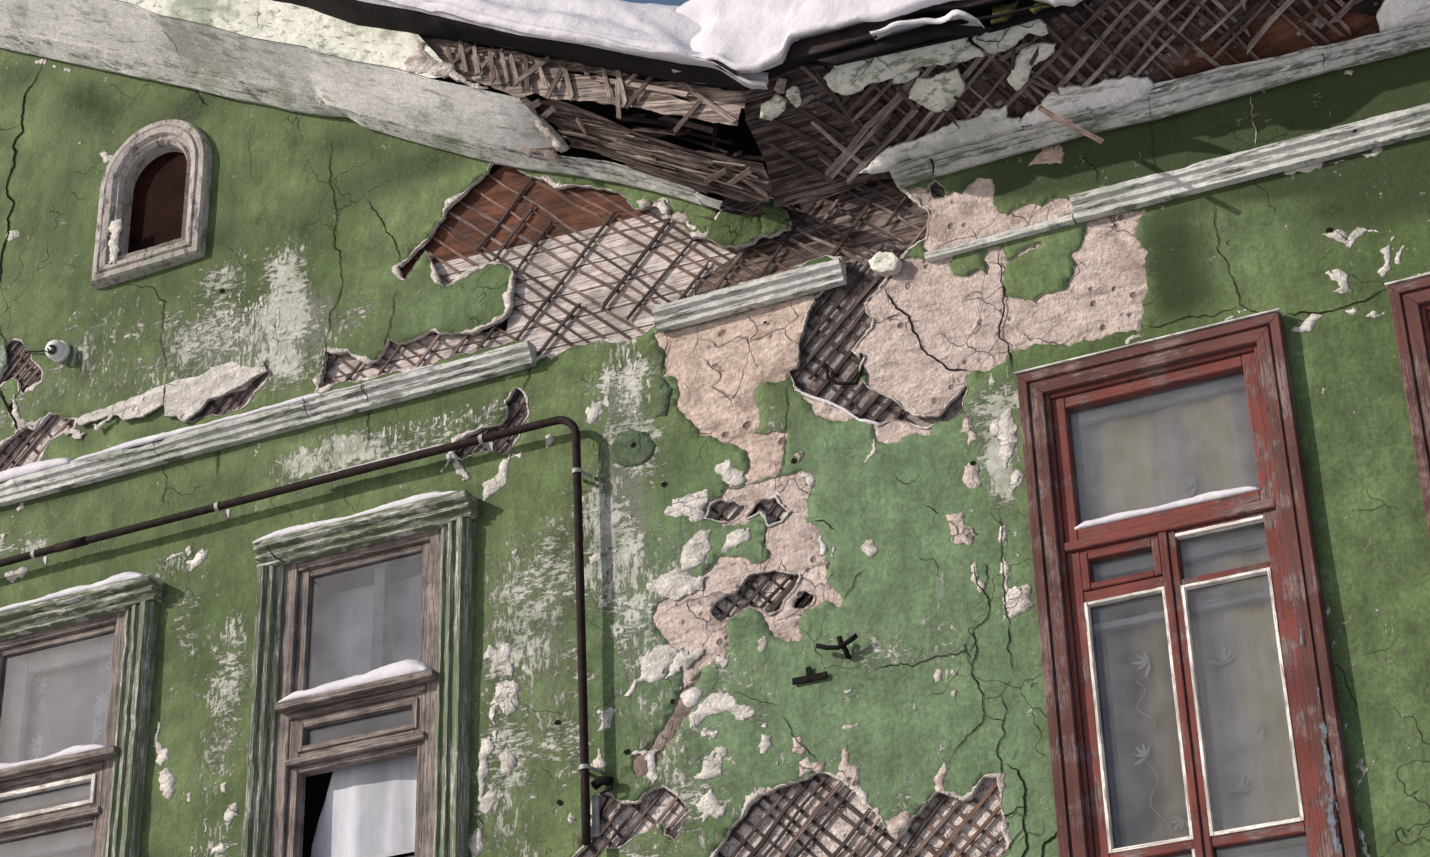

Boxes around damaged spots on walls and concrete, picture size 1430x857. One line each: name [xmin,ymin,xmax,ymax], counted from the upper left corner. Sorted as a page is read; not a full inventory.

spalling [404,40,488,91]
crack [0,63,43,279]
crack [874,285,968,371]
crack [997,249,1012,369]
crack [1143,212,1387,330]
peeling [1291,313,1323,333]
peeling [1325,269,1386,318]
peeling [1324,227,1430,277]
spalling [0,338,114,472]
spalling [186,356,271,422]
spalling [312,96,1148,857]
crack [876,510,1057,857]